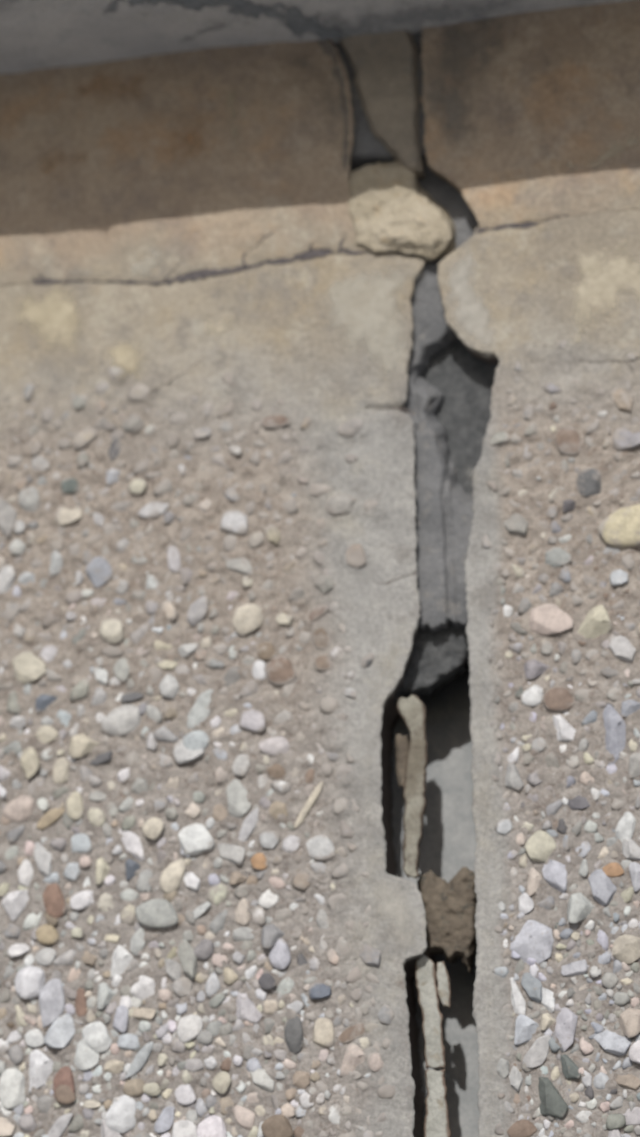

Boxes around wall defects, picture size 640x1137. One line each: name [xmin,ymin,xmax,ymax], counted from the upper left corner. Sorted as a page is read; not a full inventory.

crack [105,0,346,41]
crack [33,232,416,285]